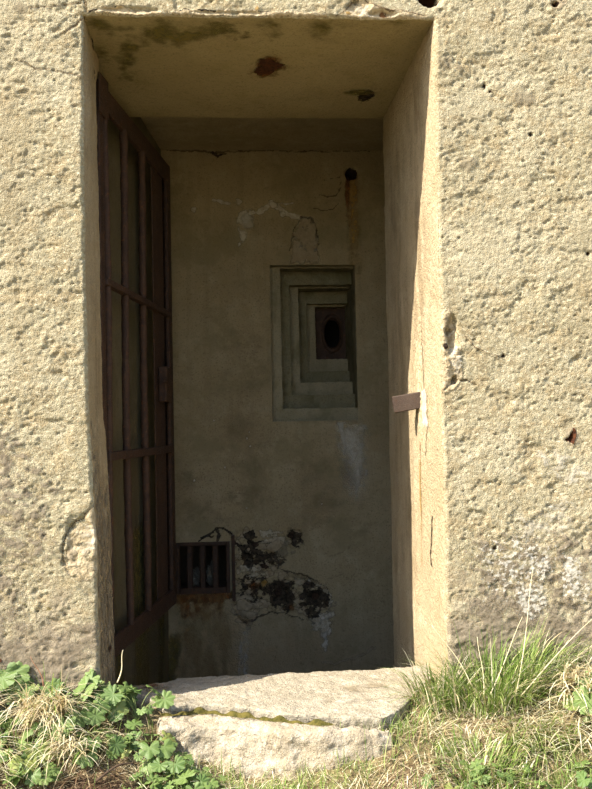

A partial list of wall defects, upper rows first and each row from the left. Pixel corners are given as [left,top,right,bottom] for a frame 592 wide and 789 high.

corrosion [254,57,285,78]
spalling [231,527,336,652]
leakage [447,520,592,680]